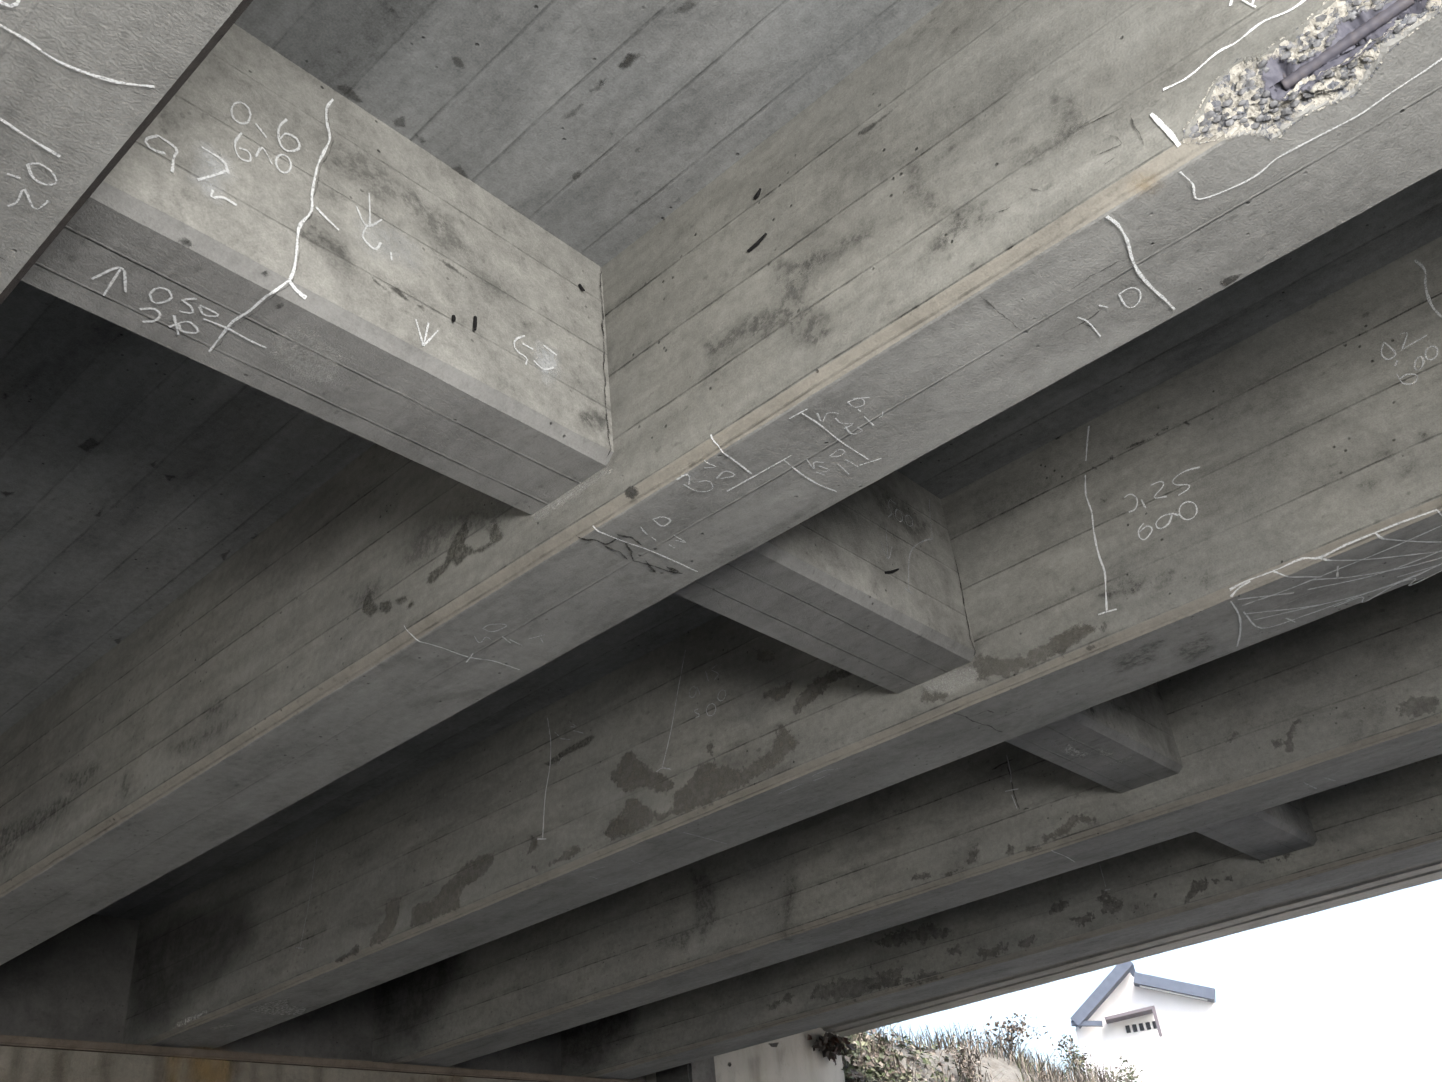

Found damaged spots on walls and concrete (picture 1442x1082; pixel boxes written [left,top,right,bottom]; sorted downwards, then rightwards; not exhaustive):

spalling [1182,0,1442,144]
water stain [427,523,502,583]
crack [578,534,682,574]
water stain [363,591,414,615]